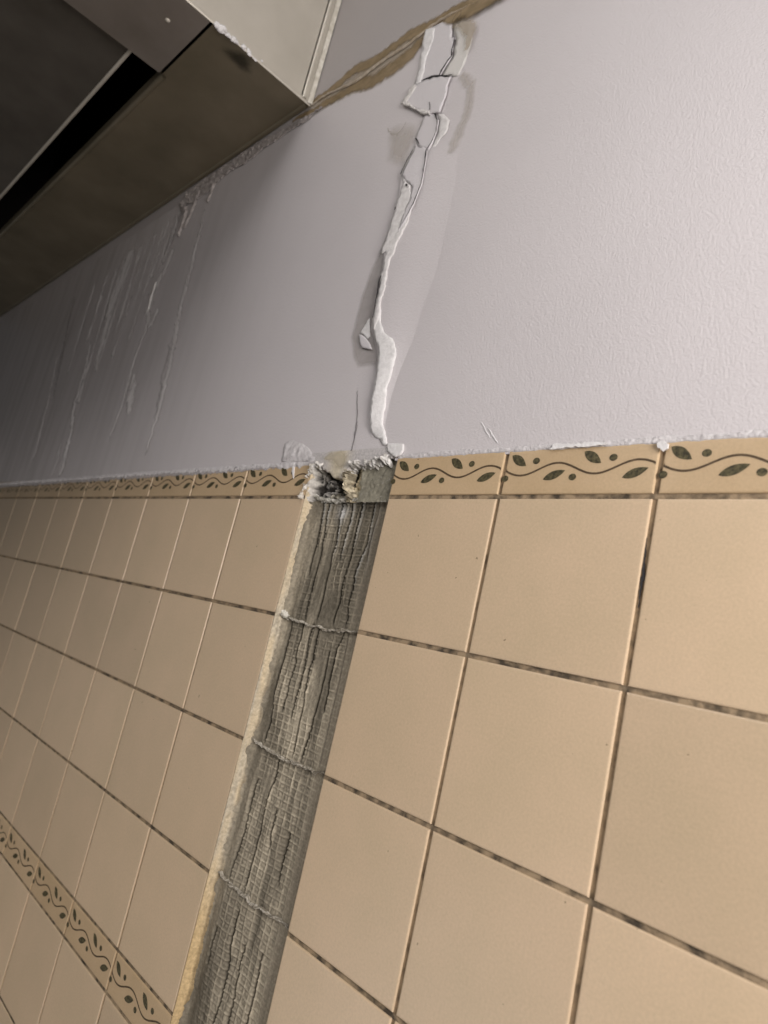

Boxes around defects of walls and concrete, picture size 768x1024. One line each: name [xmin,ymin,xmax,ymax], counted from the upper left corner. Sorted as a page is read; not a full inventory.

damp [33,211,180,476]
crack [372,275,382,318]
peeling [0,20,768,505]
crack [394,37,455,223]